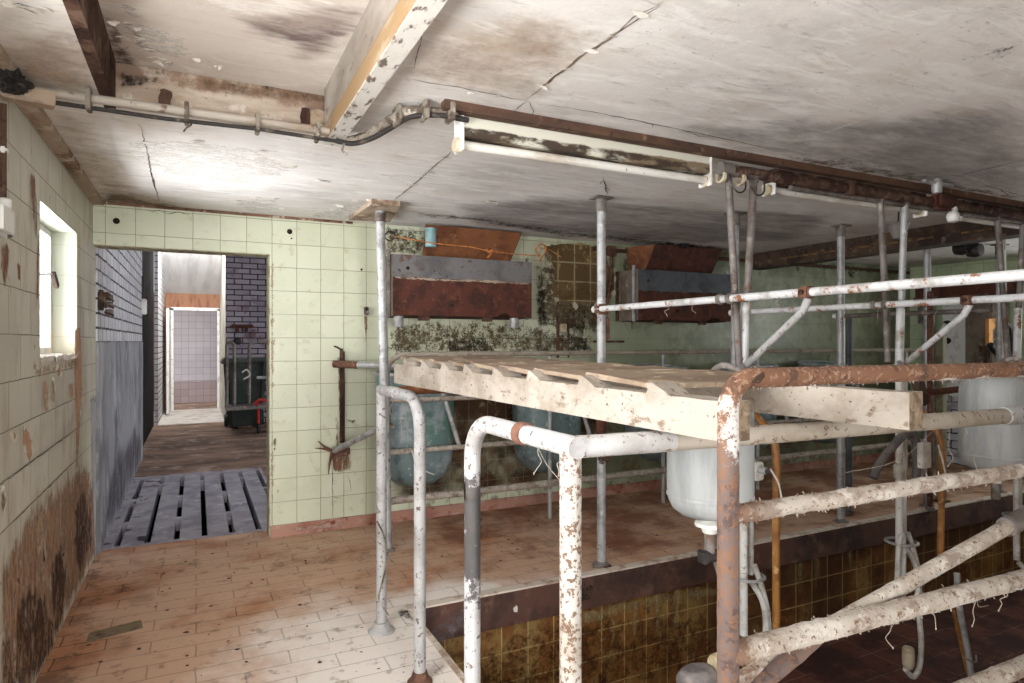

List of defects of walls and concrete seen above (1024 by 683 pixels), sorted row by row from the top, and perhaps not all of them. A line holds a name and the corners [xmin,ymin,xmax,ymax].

leakage [253,9,356,51]
crack [403,2,788,152]
crack [140,126,188,215]
flaking render [34,345,78,408]
leakage [1,470,96,683]